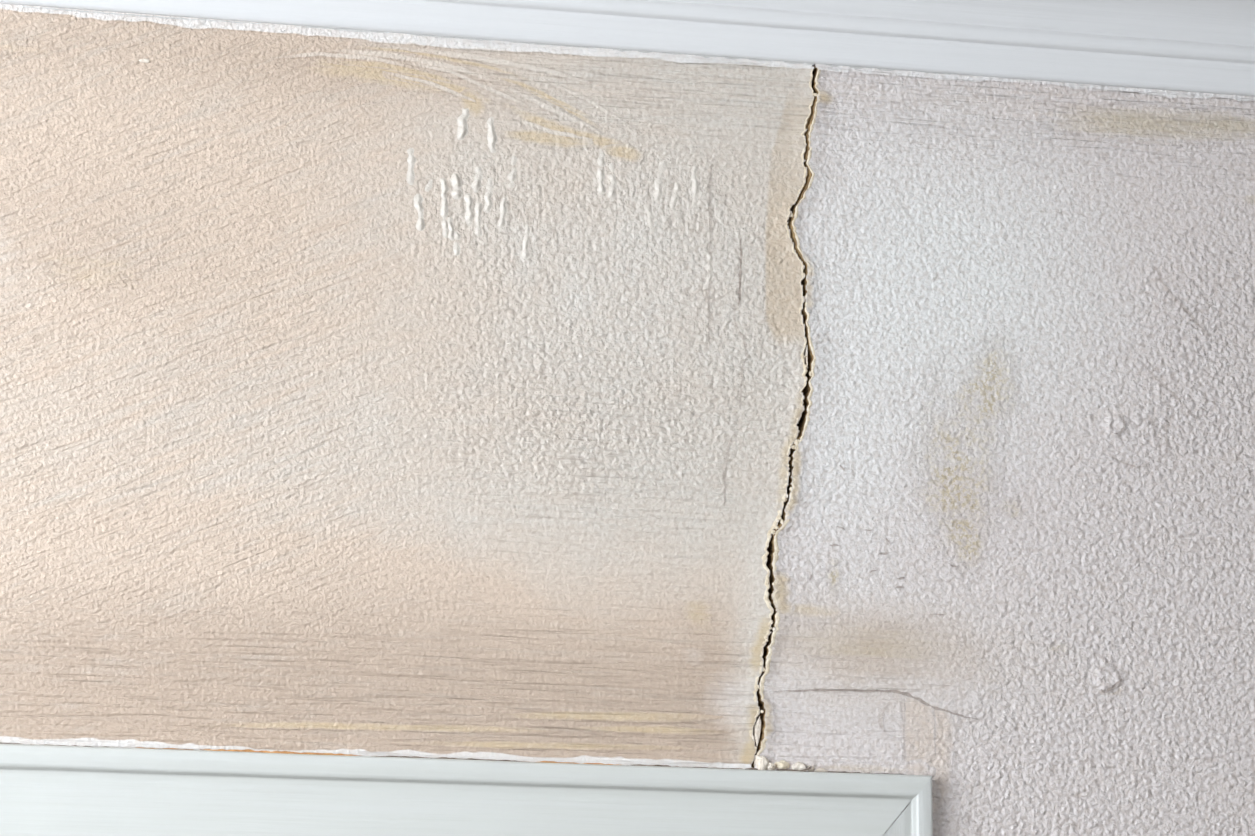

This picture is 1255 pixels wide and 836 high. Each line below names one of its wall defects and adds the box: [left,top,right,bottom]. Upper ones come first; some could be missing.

crack [22,6,261,24]
crack [295,26,986,768]